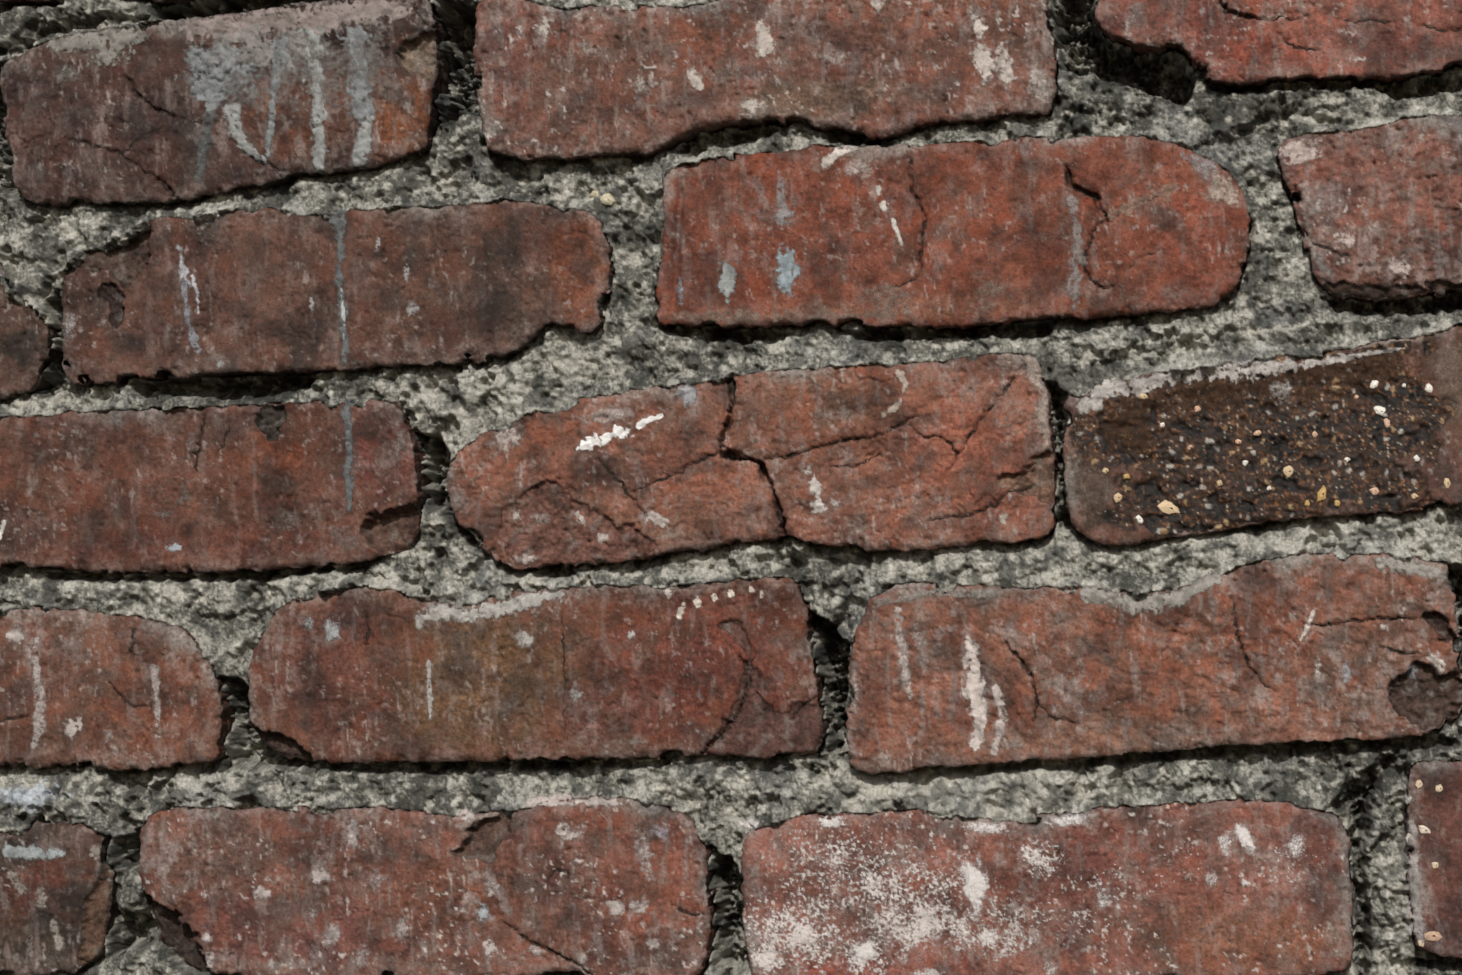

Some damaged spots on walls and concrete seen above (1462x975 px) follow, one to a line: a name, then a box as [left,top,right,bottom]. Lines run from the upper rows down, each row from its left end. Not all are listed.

crack [69,84,201,202]
crack [236,144,280,171]
crack [895,160,927,288]
crack [1065,170,1107,289]
crack [602,378,1026,534]
spalling [1069,336,1457,539]
crack [701,658,754,754]
efflorescence [739,814,1217,975]
efflorescence [1218,823,1255,856]
efflorescence [1242,834,1317,886]